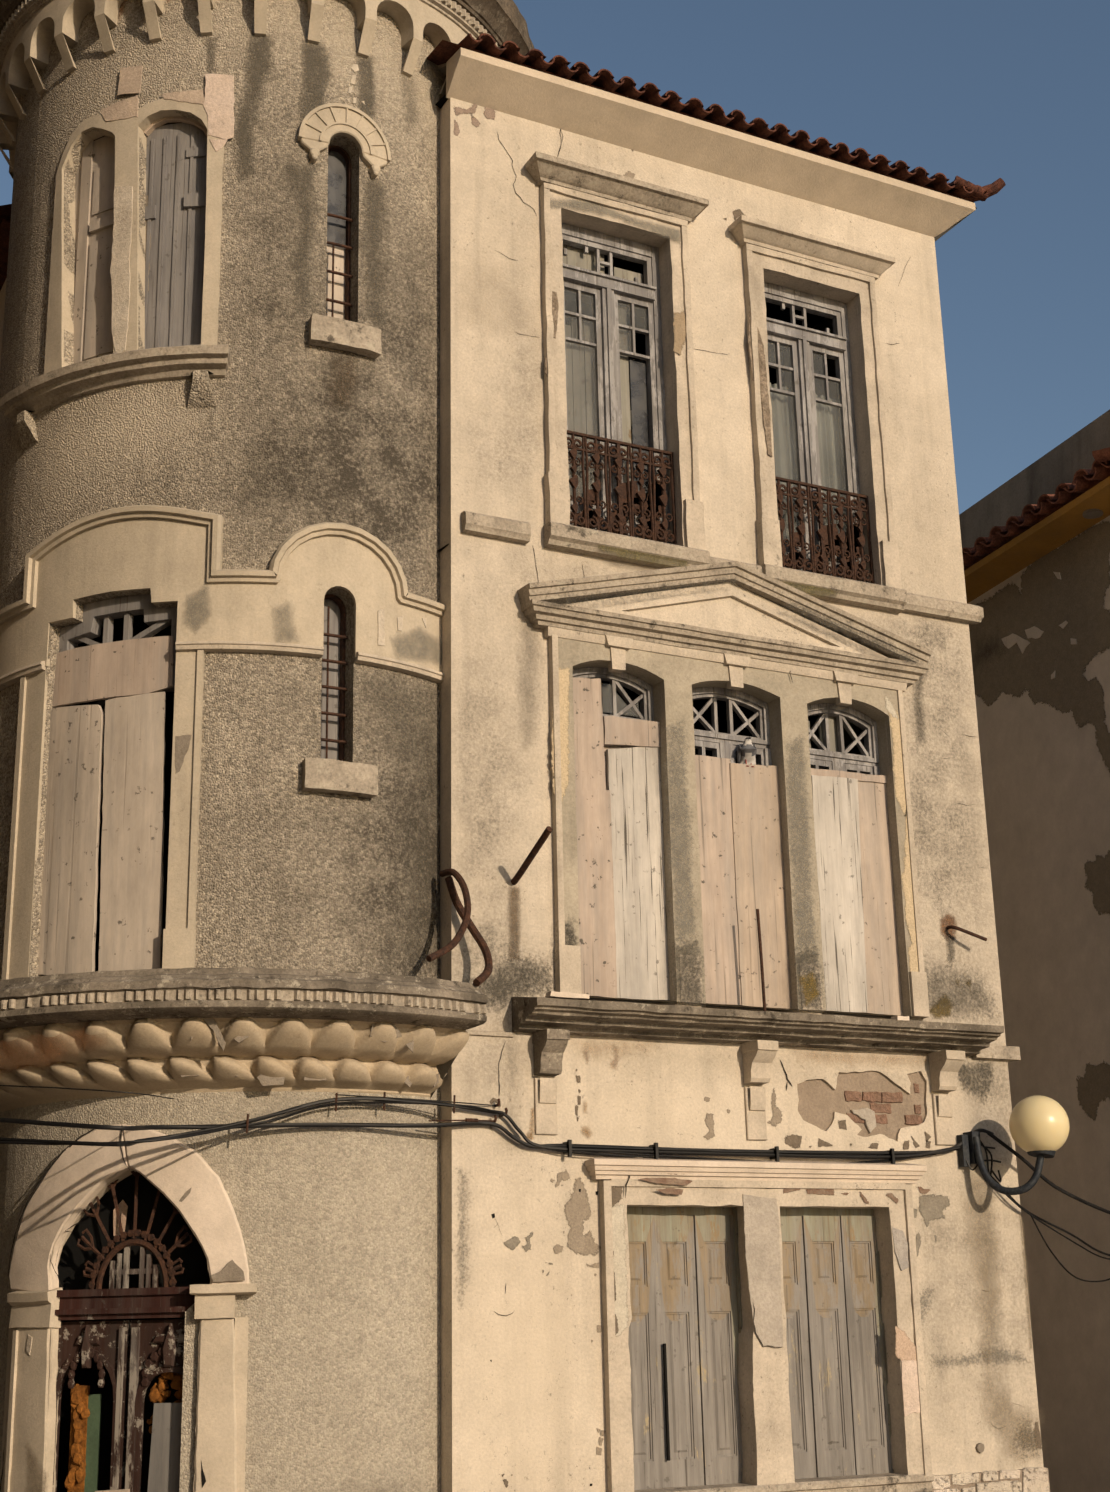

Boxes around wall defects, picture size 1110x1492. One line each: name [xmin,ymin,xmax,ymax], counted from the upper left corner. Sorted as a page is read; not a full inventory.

damp [236,36,271,176]
damp [301,44,330,118]
damp [359,56,374,118]
crack [497,132,537,216]
damp [366,183,384,321]
peeling [969,520,1110,773]
rust [941,915,956,938]
spalling [767,1071,931,1150]
peeling [1076,1061,1110,1121]
peeling [542,1169,629,1343]
peeling [743,1188,869,1347]
peeling [886,1187,950,1271]